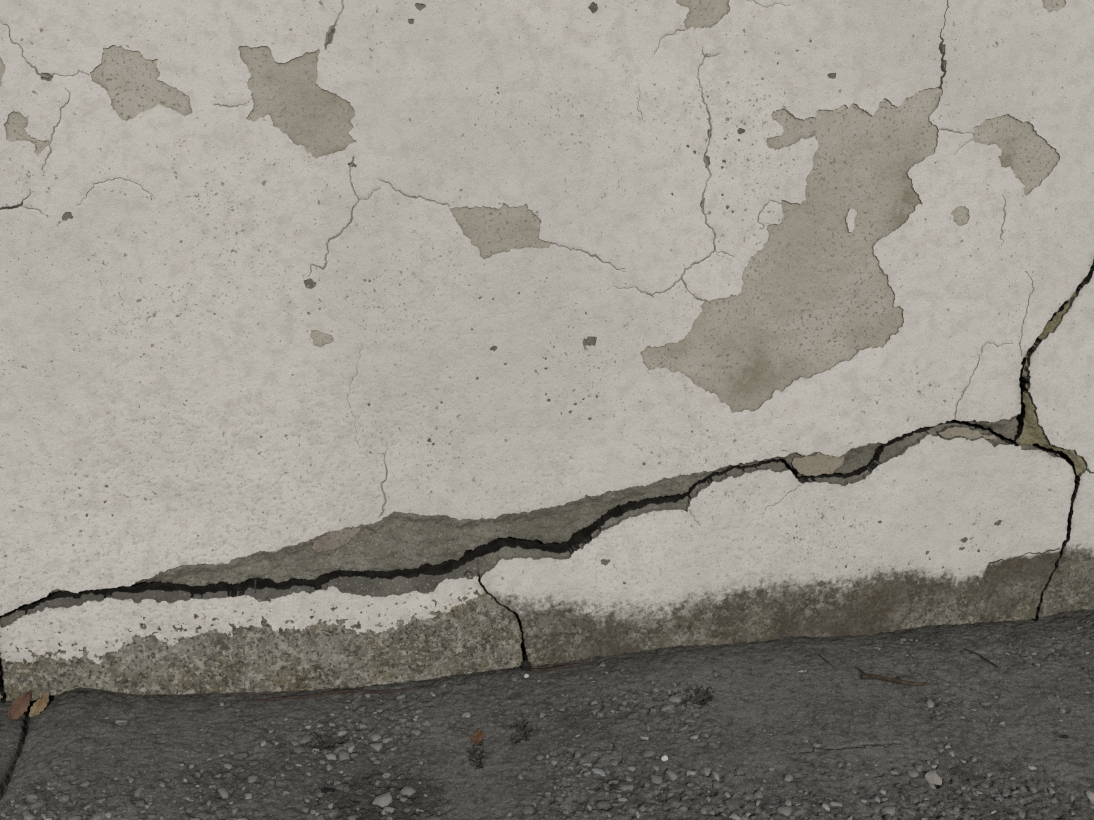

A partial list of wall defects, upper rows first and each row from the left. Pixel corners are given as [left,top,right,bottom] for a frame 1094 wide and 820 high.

crack [0,21,89,214]
peeling [90,45,192,121]
peeling [238,27,356,158]
crack [309,156,450,276]
peeling [449,203,552,259]
crack [552,29,734,301]
peeling [676,0,730,30]
peeling [640,87,942,412]
crack [939,0,949,88]
peeling [973,114,1059,195]
crack [0,259,1094,661]
leakage [497,547,1094,666]